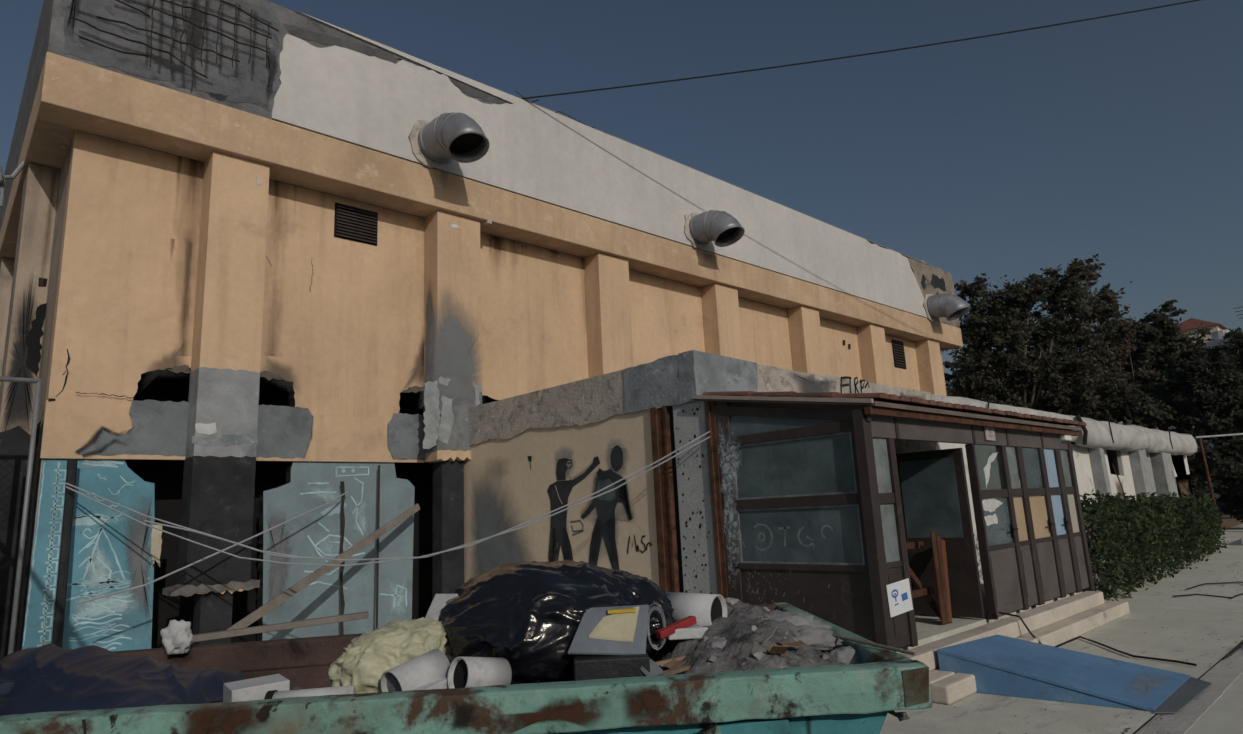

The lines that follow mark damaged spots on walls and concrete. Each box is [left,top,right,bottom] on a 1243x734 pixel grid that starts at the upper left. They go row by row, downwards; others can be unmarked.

spalling [64,0,511,110]
leakage [183,242,191,323]
crack [48,349,133,402]
peeling [166,365,285,459]